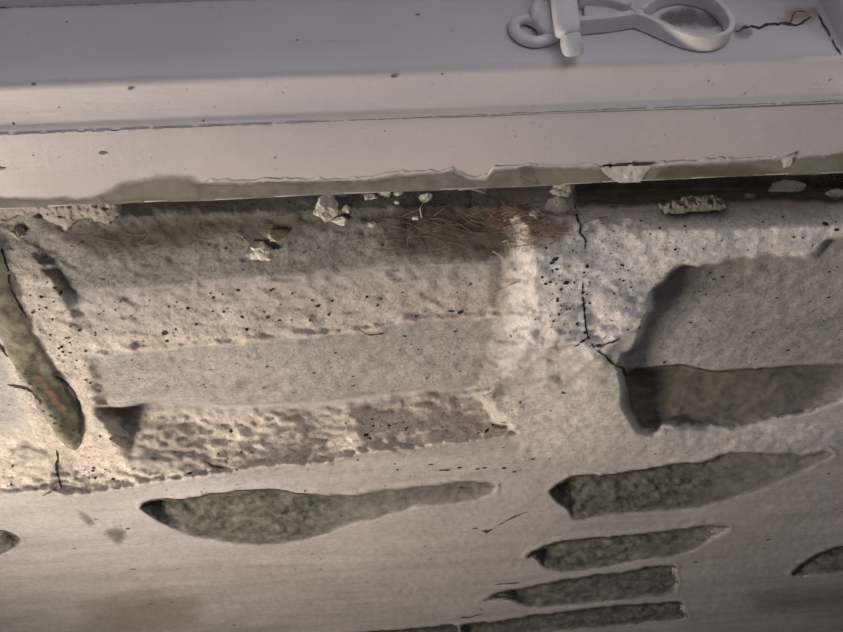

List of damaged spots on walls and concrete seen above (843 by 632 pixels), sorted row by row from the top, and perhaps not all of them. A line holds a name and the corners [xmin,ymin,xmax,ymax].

crack [735,10,841,54]
crack [0,127,183,135]
crack [233,100,839,126]
peeling [0,153,843,208]
crack [574,202,587,249]
crack [574,283,627,376]
spalling [626,365,837,429]
spalling [141,482,494,545]
spalling [550,453,771,520]
spalling [0,531,20,554]
spalling [379,526,727,632]
spalling [793,547,843,575]